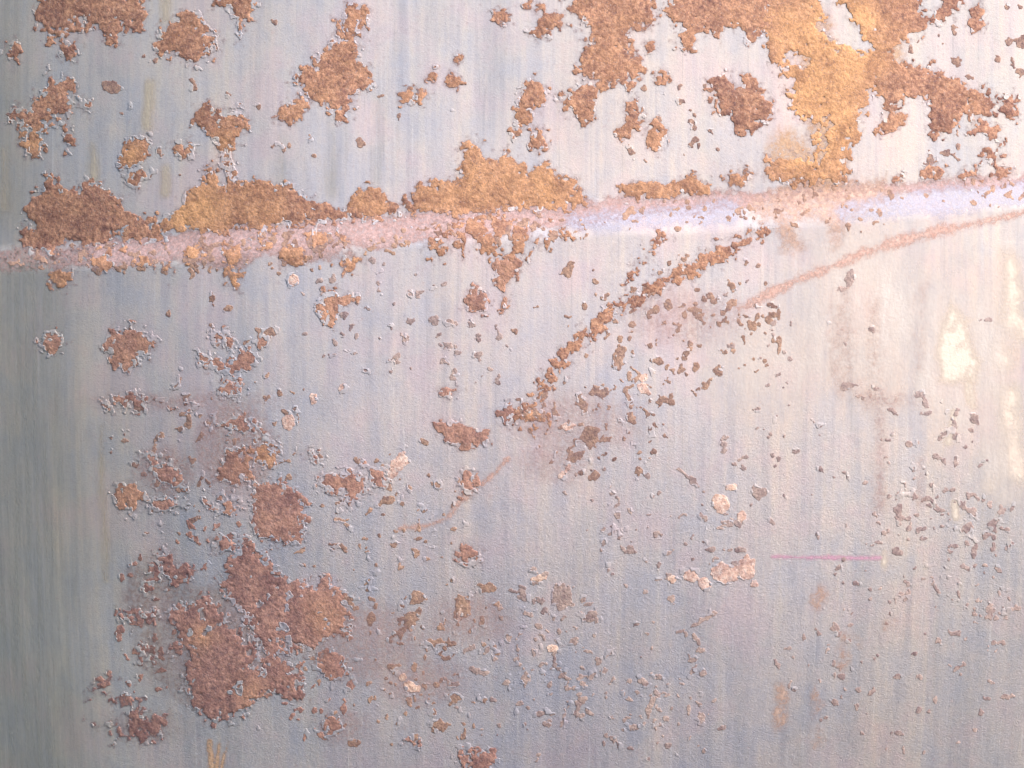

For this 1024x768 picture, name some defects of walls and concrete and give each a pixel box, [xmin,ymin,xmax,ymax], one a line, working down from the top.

rust [0,0,1024,328]
peeling [970,178,1024,208]
peeling [182,230,348,304]
peeling [363,222,461,296]
rust [99,319,162,376]
peeling [428,302,501,385]
spalling [493,180,885,605]
rust [432,418,493,451]
rust [108,325,393,768]
peeling [281,438,726,757]
rust [85,670,168,747]
rust [451,742,500,768]